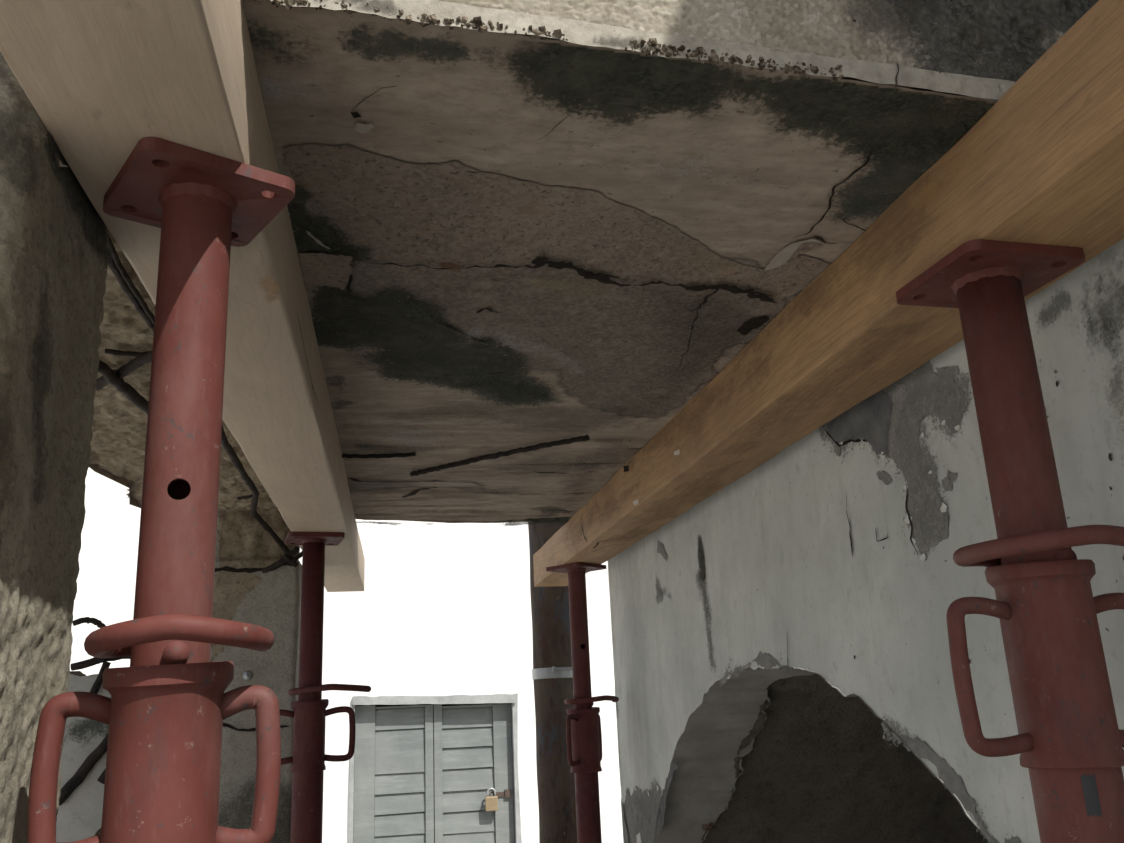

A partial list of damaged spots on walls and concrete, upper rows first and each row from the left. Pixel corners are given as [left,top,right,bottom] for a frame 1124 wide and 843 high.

crack [794,148,874,244]
water stain [831,119,978,221]
spalling [90,232,155,502]
crack [345,257,777,368]
peeling [819,361,973,561]
spalling [212,419,303,620]
peeling [719,651,783,689]
peeling [621,762,677,843]
peeling [880,714,1020,843]